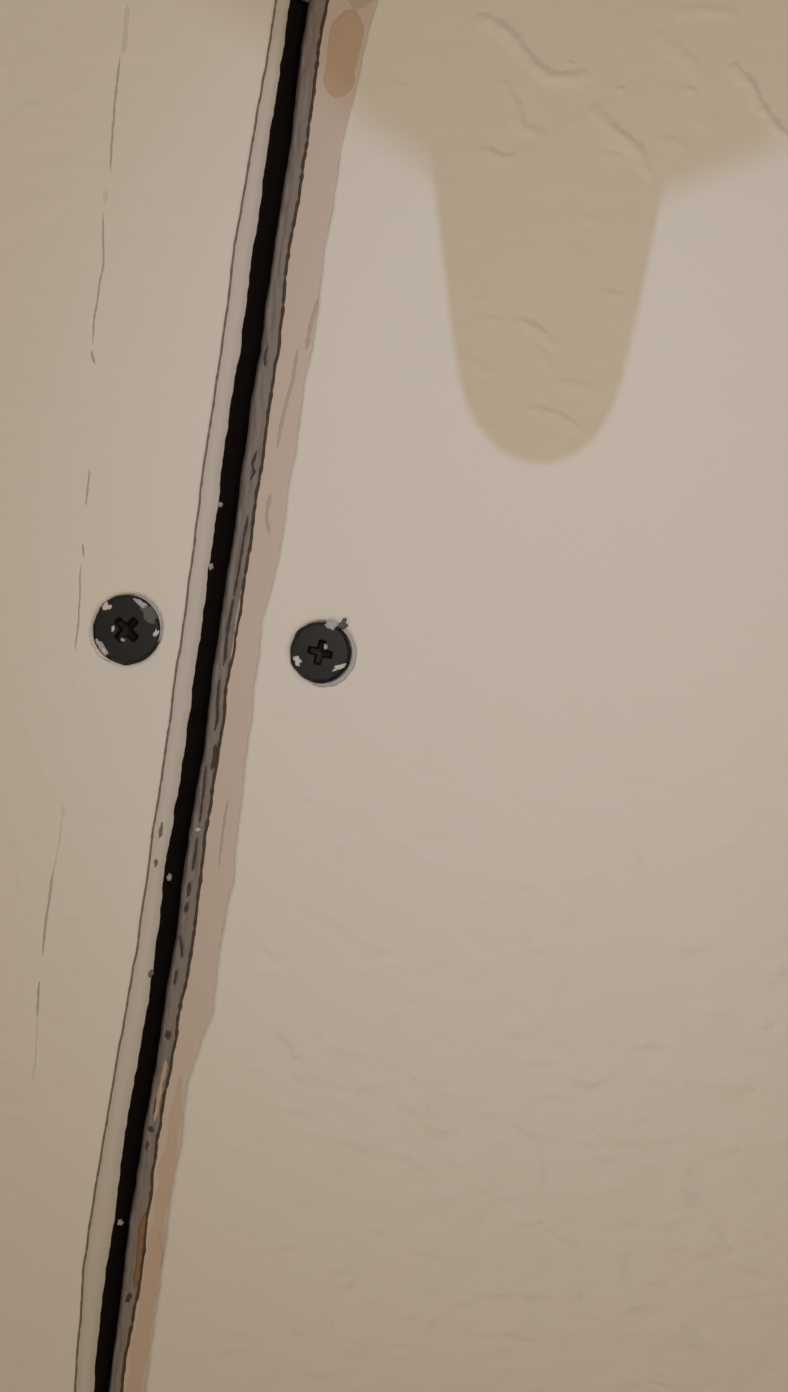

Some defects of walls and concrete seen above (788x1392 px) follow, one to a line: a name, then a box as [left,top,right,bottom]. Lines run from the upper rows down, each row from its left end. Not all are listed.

crack [74,0,329,1392]
damp [323,0,375,98]